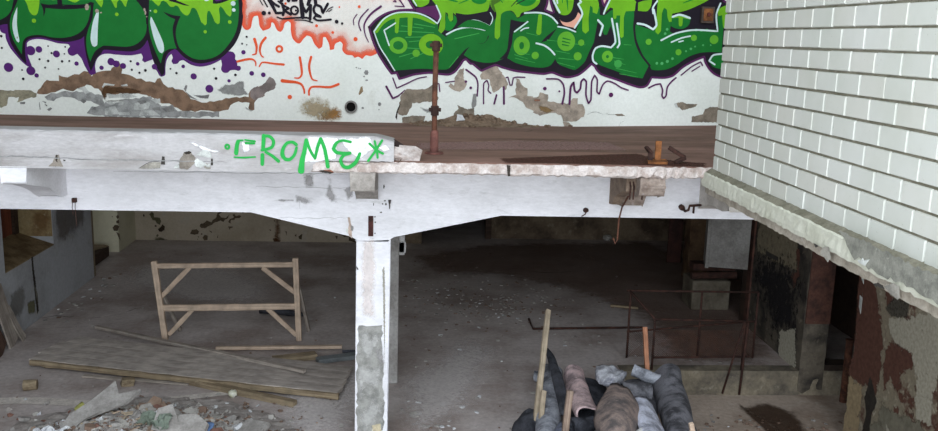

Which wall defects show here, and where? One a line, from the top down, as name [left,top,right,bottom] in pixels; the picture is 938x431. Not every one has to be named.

spalling [0,61,276,118]
spalling [395,85,438,123]
spalling [449,68,477,115]
spalling [480,66,585,127]
spalling [674,102,720,123]
flaking render [143,212,166,240]
flaking render [190,212,251,240]
peeling [356,267,385,431]
flaking render [838,230,938,431]